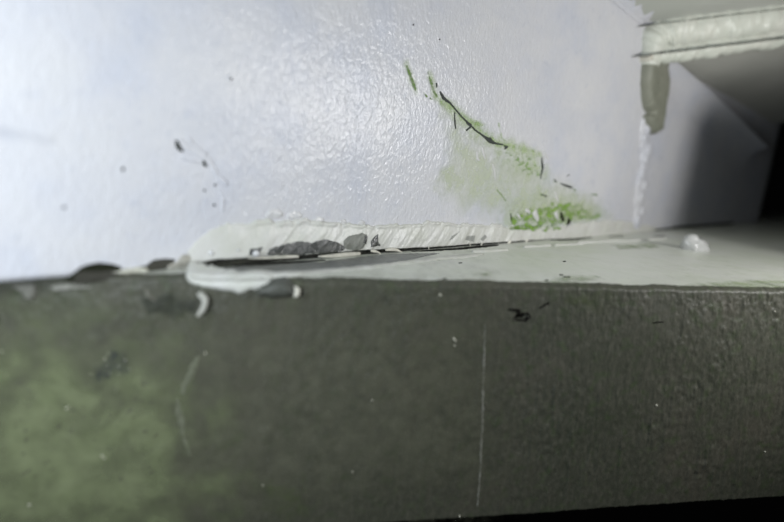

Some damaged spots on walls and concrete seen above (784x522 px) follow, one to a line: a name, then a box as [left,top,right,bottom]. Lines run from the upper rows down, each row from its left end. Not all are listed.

peeling [224,233,439,272]